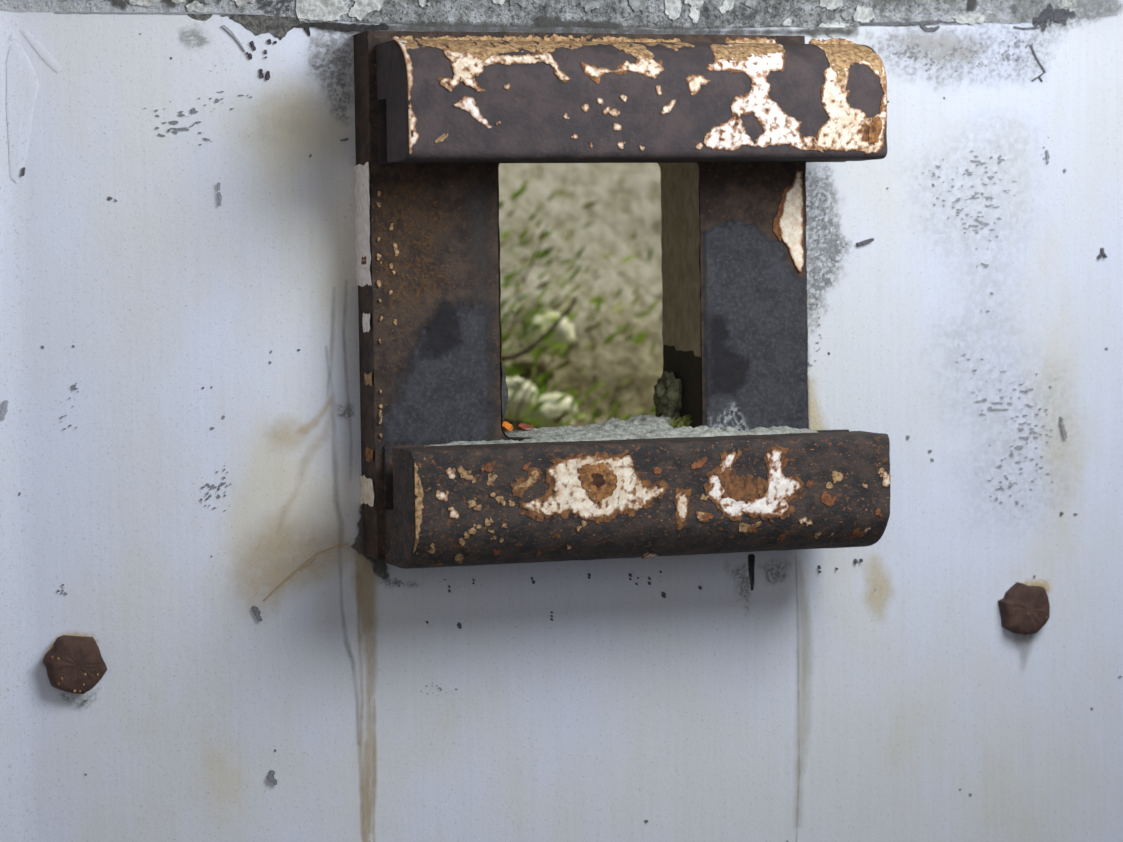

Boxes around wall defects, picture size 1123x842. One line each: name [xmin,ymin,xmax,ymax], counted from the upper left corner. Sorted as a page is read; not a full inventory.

leakage [806,170,849,431]
spalling [591,473,606,488]